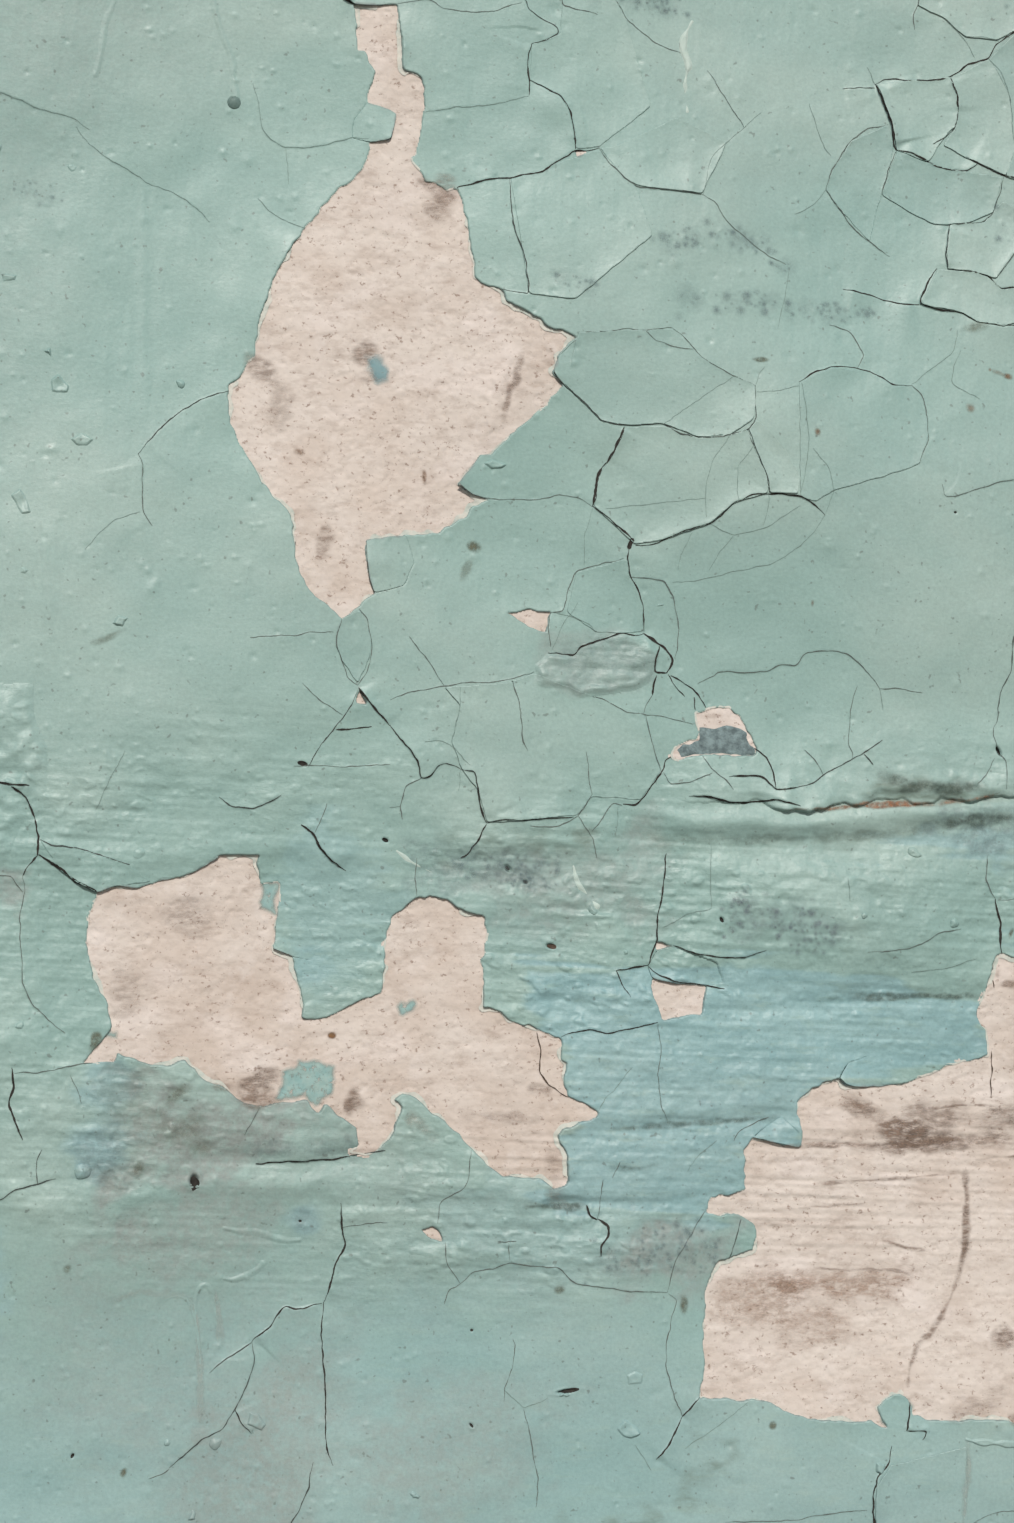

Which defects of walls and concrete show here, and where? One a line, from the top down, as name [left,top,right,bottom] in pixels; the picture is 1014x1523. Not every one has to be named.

peeling [228,0,928,619]
crack [250,0,1014,858]
crack [221,795,346,871]
peeling [446,674,756,822]
crack [149,1206,383,1523]
peeling [39,840,597,1188]
crack [504,1340,547,1506]
crack [437,1156,748,1470]
crack [689,1117,768,1168]
crack [732,1405,927,1523]
peeling [700,953,1014,1427]